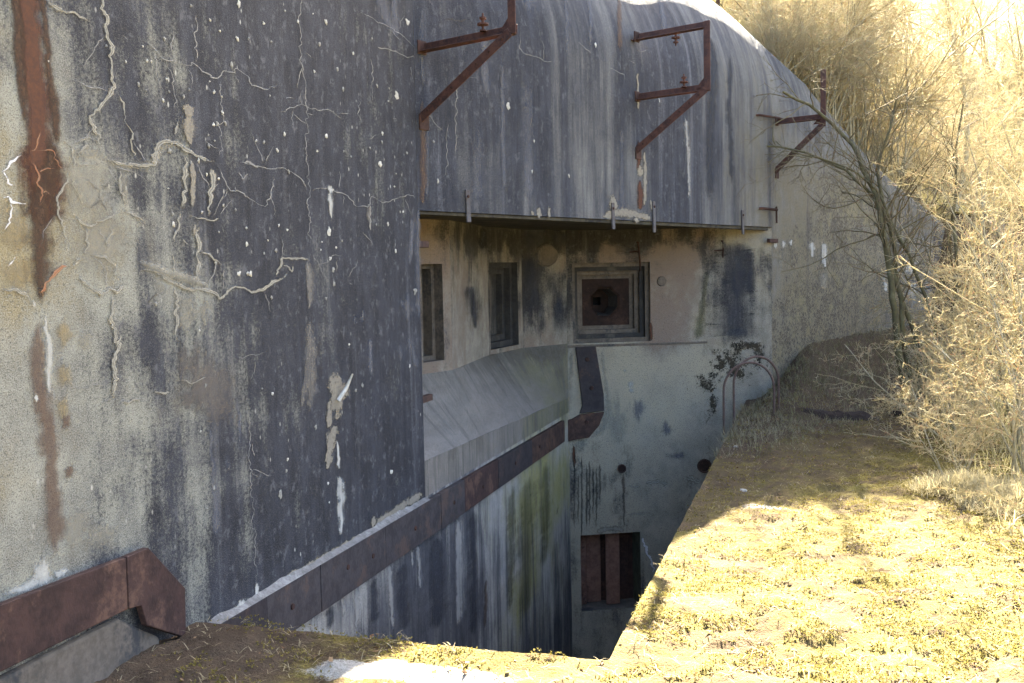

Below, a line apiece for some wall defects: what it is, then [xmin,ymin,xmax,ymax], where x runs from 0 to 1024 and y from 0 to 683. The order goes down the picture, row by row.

rust [12,0,65,297]
crack [2,0,415,404]
leakage [481,41,506,186]
leakage [707,42,733,194]
leakage [465,287,478,327]
leakage [696,245,755,339]
rust [32,328,72,546]
spalling [325,372,349,469]
leakage [573,443,601,535]